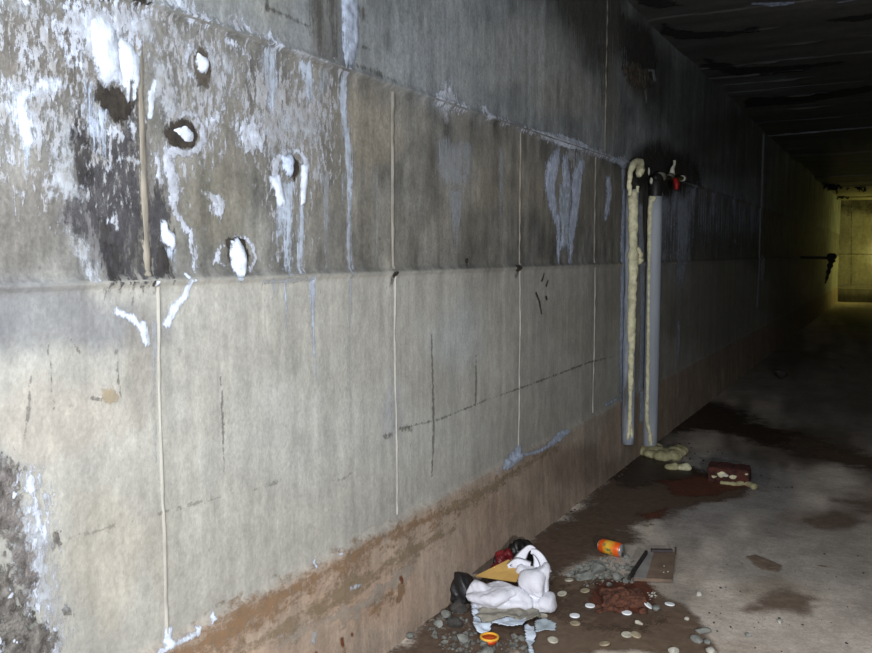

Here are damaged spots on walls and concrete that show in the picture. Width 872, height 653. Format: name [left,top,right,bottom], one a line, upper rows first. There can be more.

hole [93,81,137,126]
damp [0,0,382,355]
damp [433,78,872,423]
spalling [0,452,74,653]
rust [172,447,558,653]
crack [411,334,486,477]
efflorescence [497,429,570,474]
crack [506,358,606,394]